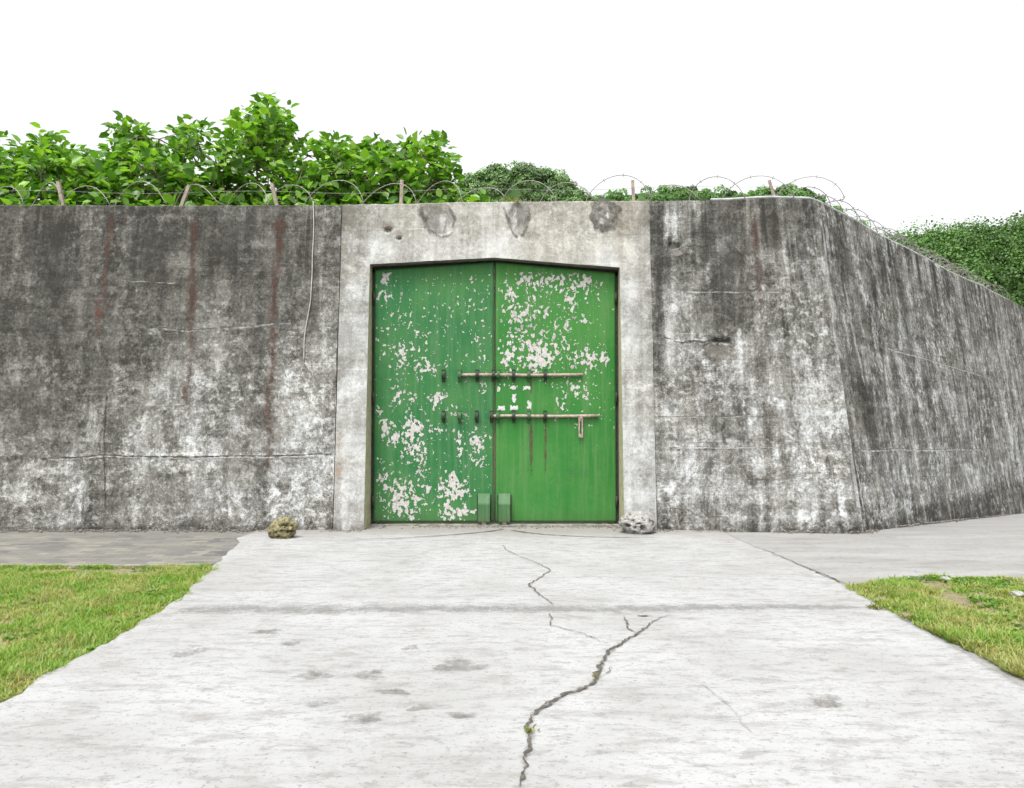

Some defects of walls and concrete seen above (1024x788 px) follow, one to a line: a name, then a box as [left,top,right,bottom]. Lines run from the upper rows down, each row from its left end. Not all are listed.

rust [265,219,285,465]
peeling [375,272,613,521]
crack [664,335,713,343]
crack [505,548,667,786]